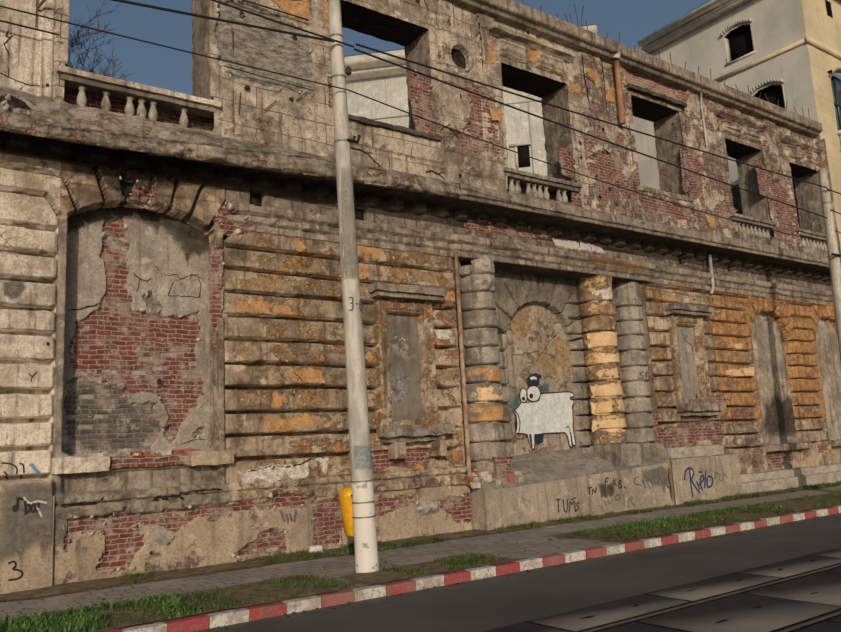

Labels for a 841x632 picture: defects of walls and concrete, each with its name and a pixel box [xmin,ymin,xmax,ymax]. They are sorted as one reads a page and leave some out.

spalling [214,0,315,103]
crack [350,147,380,166]
spalling [409,69,440,136]
spalling [457,79,506,159]
spalling [559,140,625,201]
spalling [755,160,801,239]
spalling [64,217,204,455]
crack [133,273,201,298]
spalling [208,203,325,434]
peeling [717,343,755,378]
leakage [765,392,802,434]
spalling [63,457,344,572]